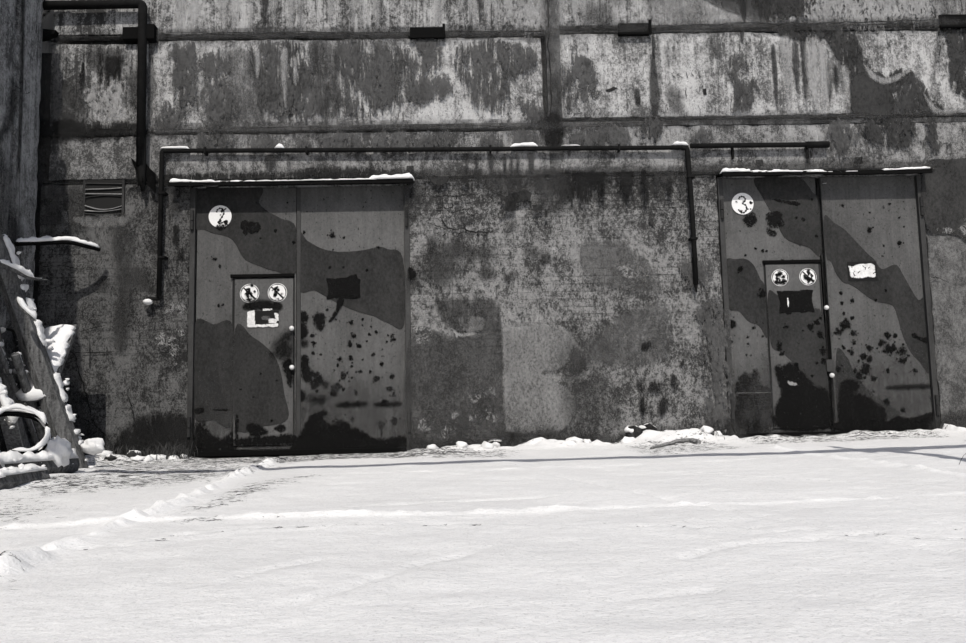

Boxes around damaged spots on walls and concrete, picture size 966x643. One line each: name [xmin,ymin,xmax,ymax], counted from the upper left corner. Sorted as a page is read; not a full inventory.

water stain [738,0,746,44]
water stain [0,0,25,171]
water stain [310,41,338,118]
water stain [569,32,664,152]
water stain [772,37,838,113]
water stain [127,102,963,214]
water stain [10,221,21,262]
water stain [411,238,515,287]
water stain [637,375,678,416]
water stain [408,441,456,450]
water stain [504,429,626,447]
water stain [701,418,746,438]